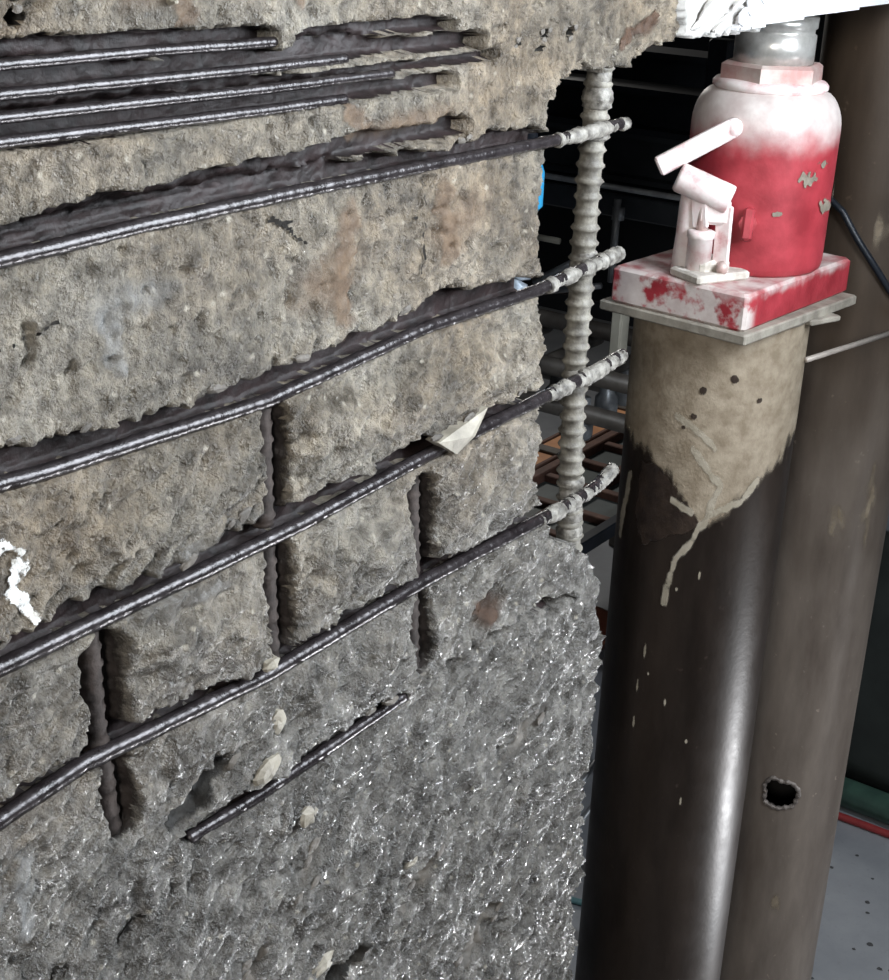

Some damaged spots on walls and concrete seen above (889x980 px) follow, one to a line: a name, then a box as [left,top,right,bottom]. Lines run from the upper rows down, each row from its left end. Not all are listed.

spalling [0,36,278,72]
spalling [534,27,552,52]
spalling [564,24,579,42]
spalling [0,53,632,844]
leakage [0,539,41,625]